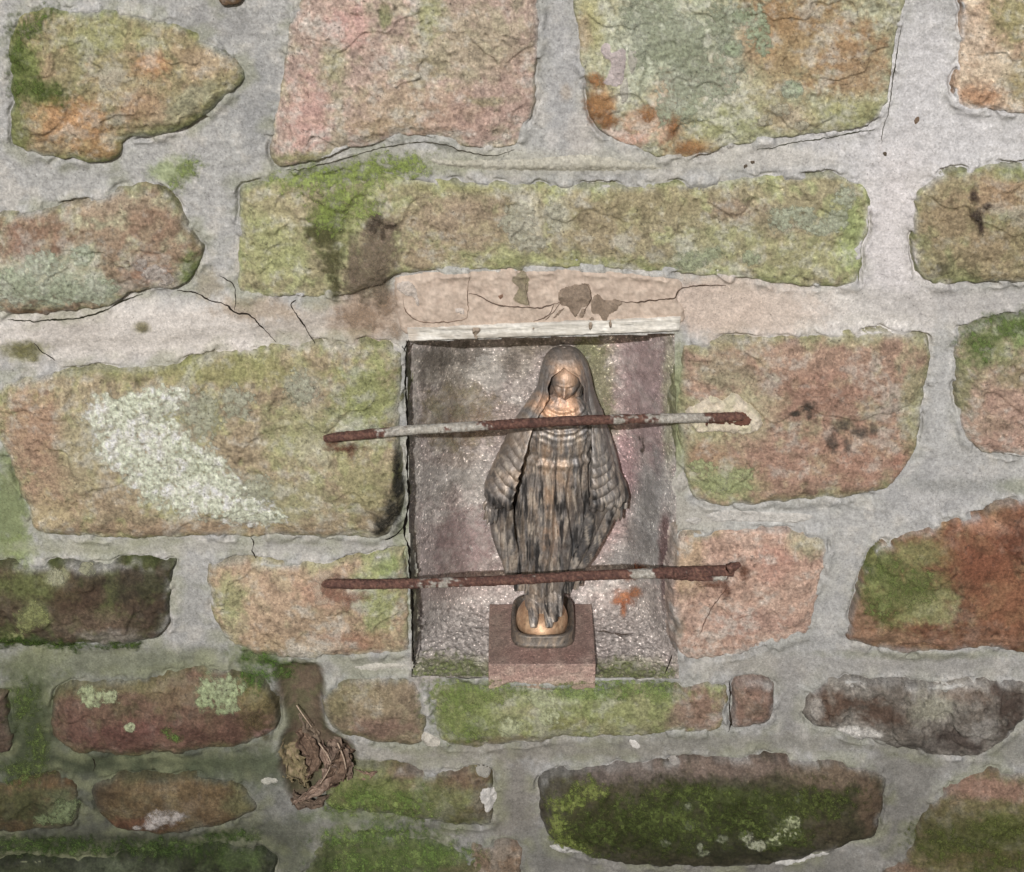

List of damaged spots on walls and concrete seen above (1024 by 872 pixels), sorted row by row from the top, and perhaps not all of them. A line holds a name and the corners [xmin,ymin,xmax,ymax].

crack [757,26,902,150]
crack [8,294,141,360]
crack [177,276,276,342]
leakage [304,215,398,330]
spalling [553,283,622,331]
crack [620,284,726,303]
leakage [374,451,404,535]
crack [386,276,592,661]
corrosion [613,587,640,614]